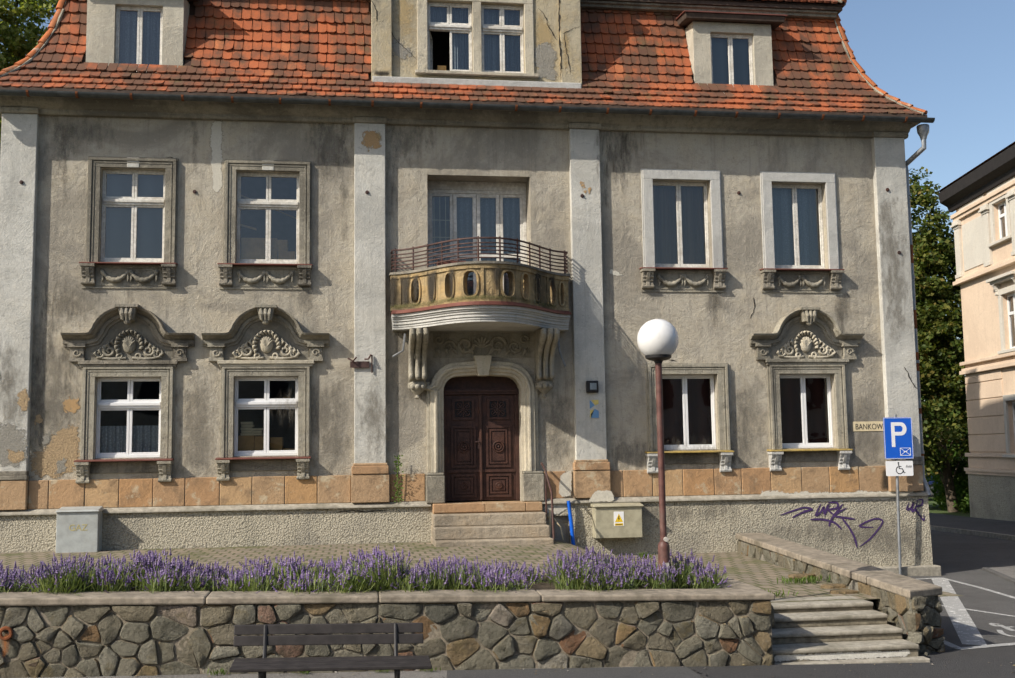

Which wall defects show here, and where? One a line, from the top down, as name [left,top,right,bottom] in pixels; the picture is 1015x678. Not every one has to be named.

crack [538,0,577,76]
peeling [361,129,382,152]
peeling [0,388,80,479]